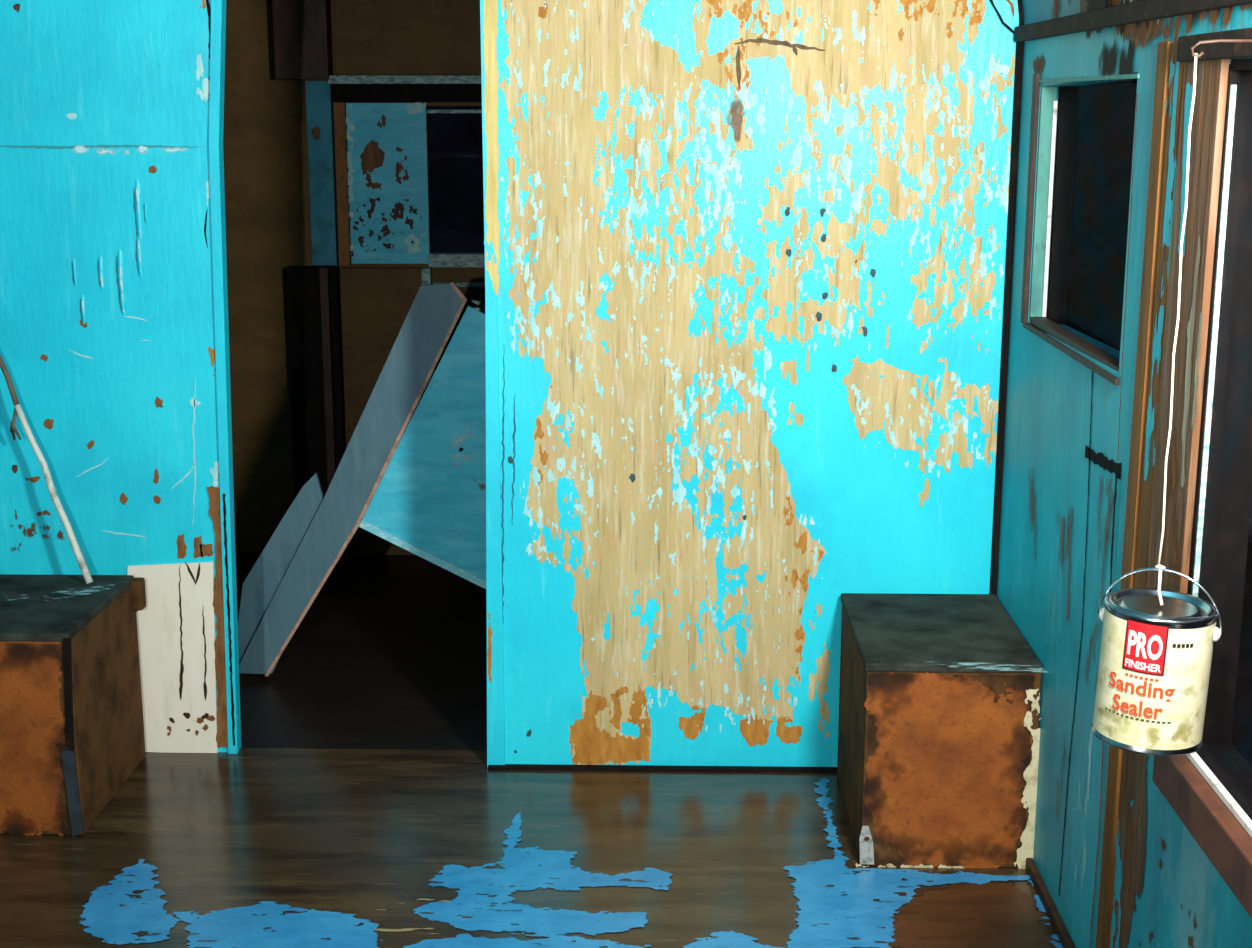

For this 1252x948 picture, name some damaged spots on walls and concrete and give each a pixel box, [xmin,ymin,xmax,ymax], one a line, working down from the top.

peeling [483,0,1015,765]
crack [734,38,825,90]
peeling [1144,60,1203,488]
peeling [1113,750,1147,948]